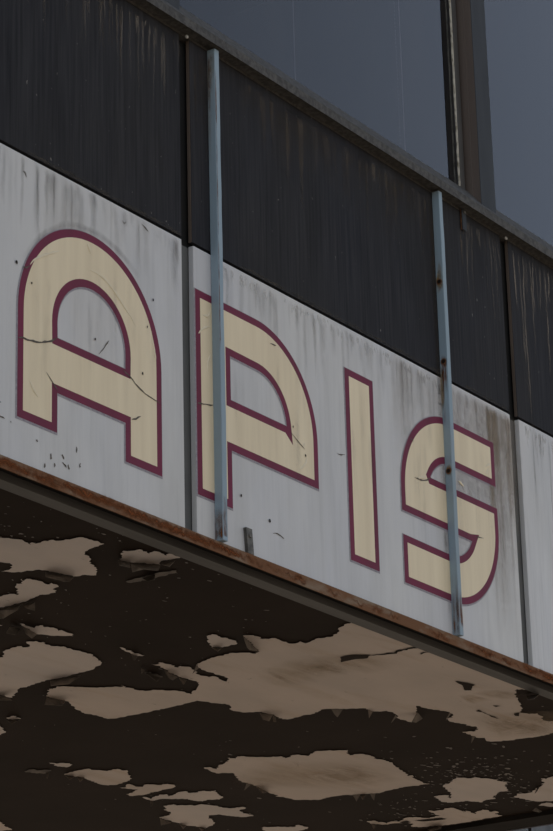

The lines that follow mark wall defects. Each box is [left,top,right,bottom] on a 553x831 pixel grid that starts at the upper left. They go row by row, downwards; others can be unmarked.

crack [18,336,58,344]
corrosion [0,458,245,560]
peeling [0,537,553,743]
peeling [25,763,253,831]
peeling [204,750,426,802]
peeling [367,777,553,831]